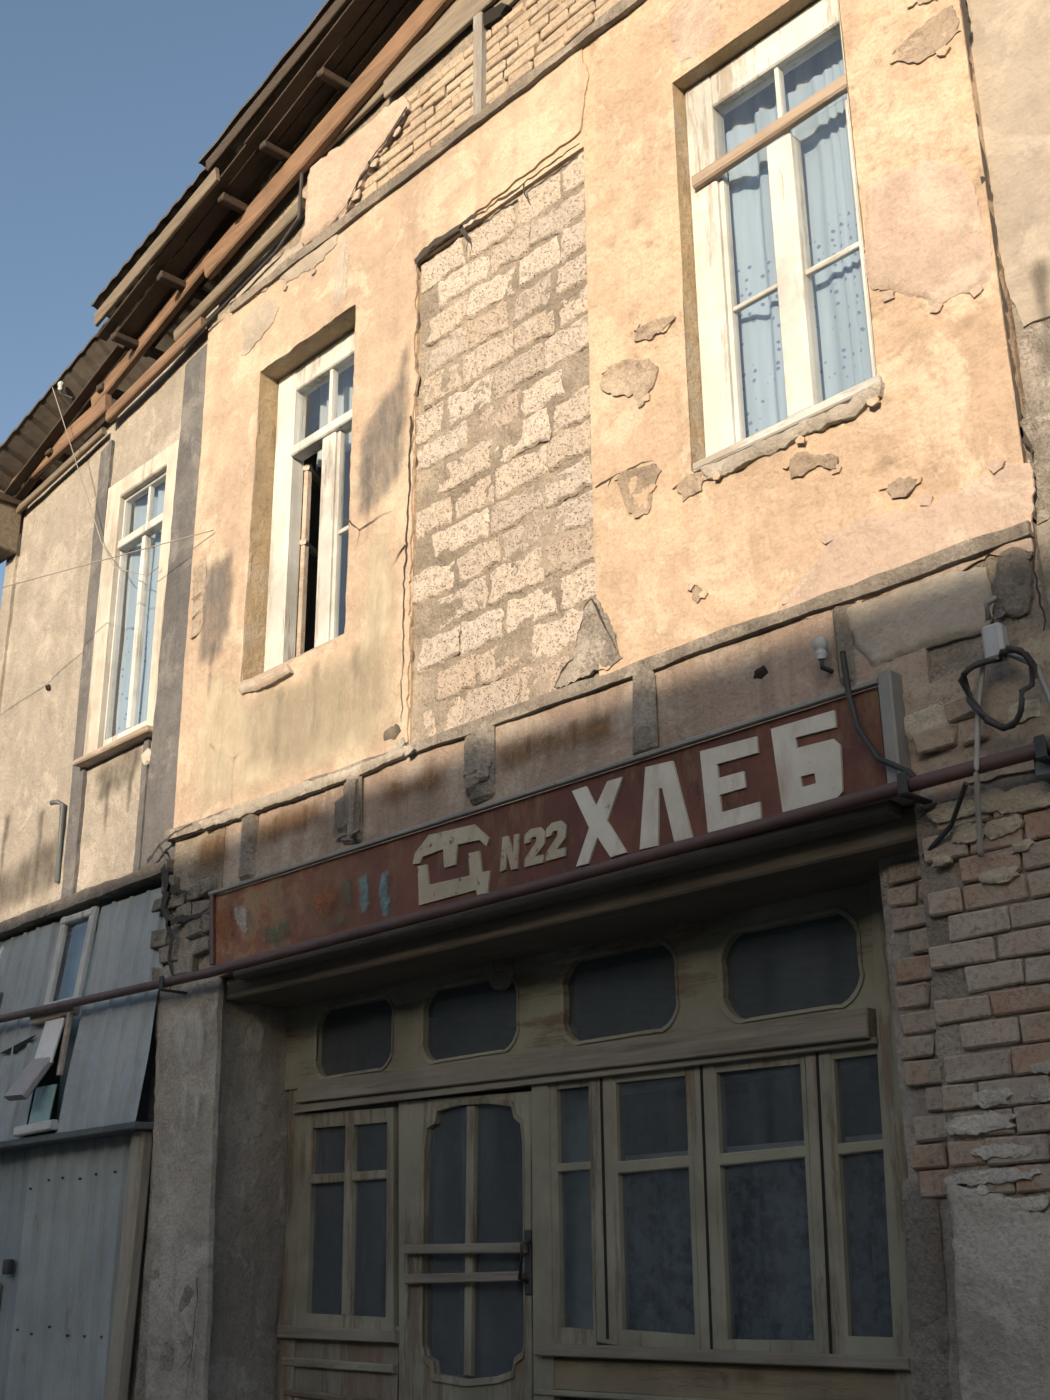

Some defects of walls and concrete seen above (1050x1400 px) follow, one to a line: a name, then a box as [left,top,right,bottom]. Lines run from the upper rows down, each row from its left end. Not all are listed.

peeling [229,95,412,356]
crack [414,143,579,265]
spalling [614,463,722,519]
spalling [782,435,842,479]
peeling [780,457,1036,627]
rust [503,718,608,765]
spalling [150,875,218,981]
flaking render [902,629,1050,1400]